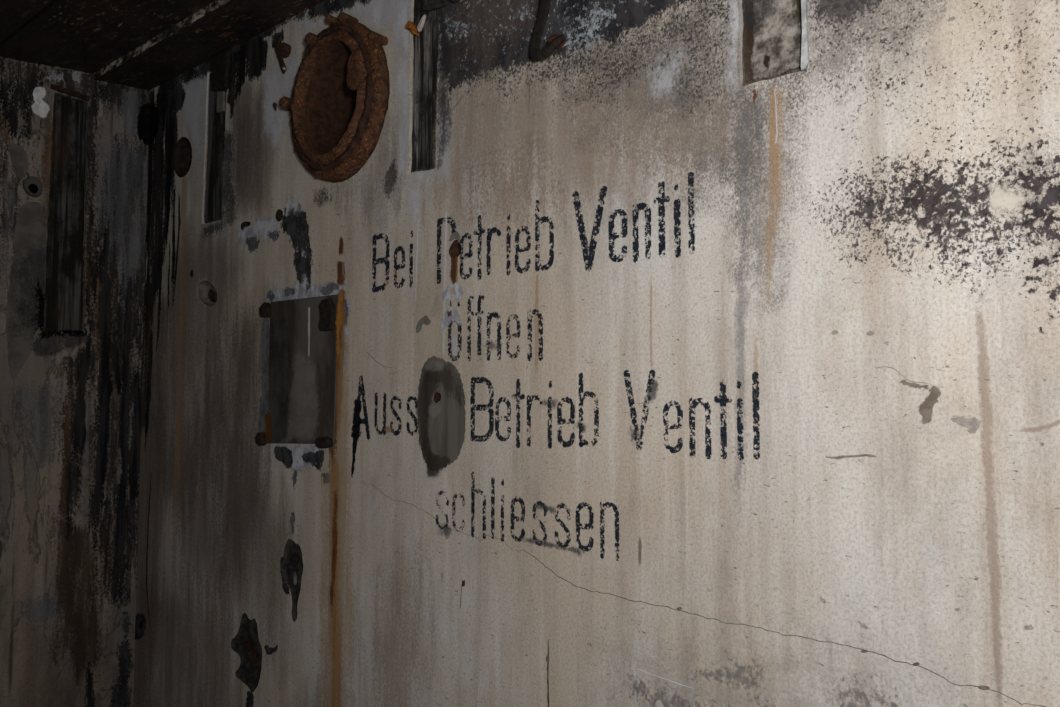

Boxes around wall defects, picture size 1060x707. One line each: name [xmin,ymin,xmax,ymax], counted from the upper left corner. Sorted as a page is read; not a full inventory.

leakage [445,0,738,132]
leakage [97,138,148,284]
leakage [790,0,1060,318]
peeling [246,198,350,376]
leakage [133,158,280,707]
peeling [259,317,270,432]
peeling [273,443,330,486]
rust [329,238,345,707]
spalling [231,613,278,707]
spalling [280,511,303,622]
crack [359,483,1046,707]